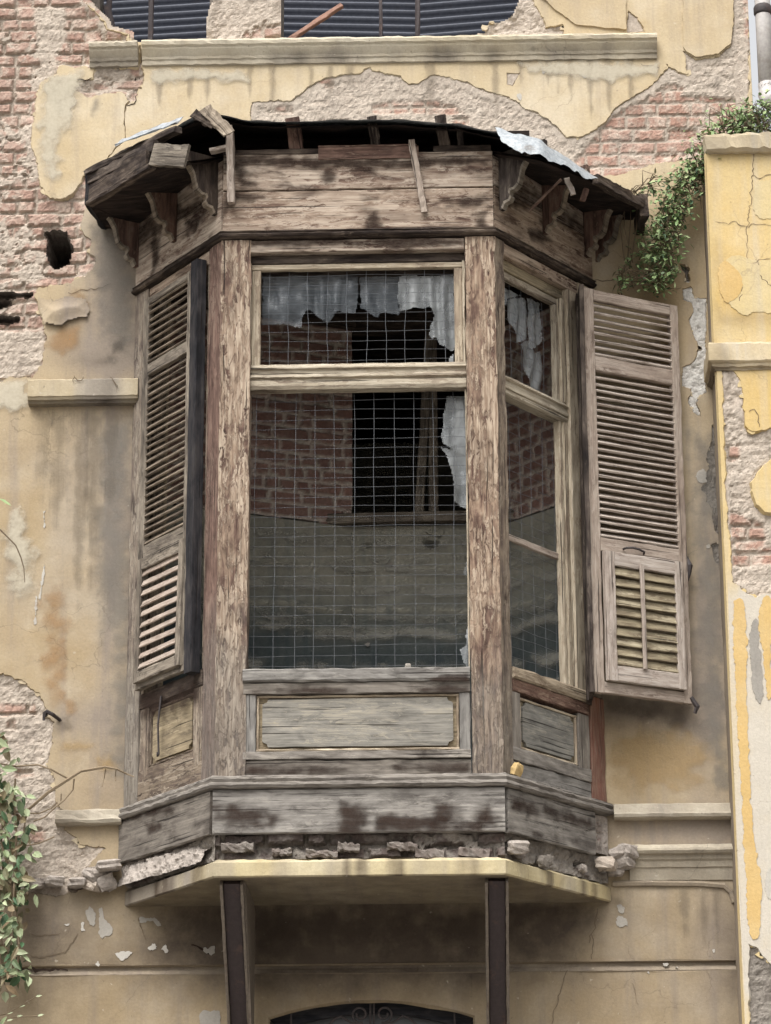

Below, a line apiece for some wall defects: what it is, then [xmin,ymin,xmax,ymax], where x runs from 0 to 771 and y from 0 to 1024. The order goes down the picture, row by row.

damp [152,68,249,83]
spalling [250,0,753,176]
spalling [0,0,144,383]
crack [715,157,771,301]
spalling [681,264,707,416]
damp [5,508,39,591]
spalling [696,371,771,1024]
spalling [0,674,639,896]
peeling [64,906,113,939]
peeling [115,951,132,961]